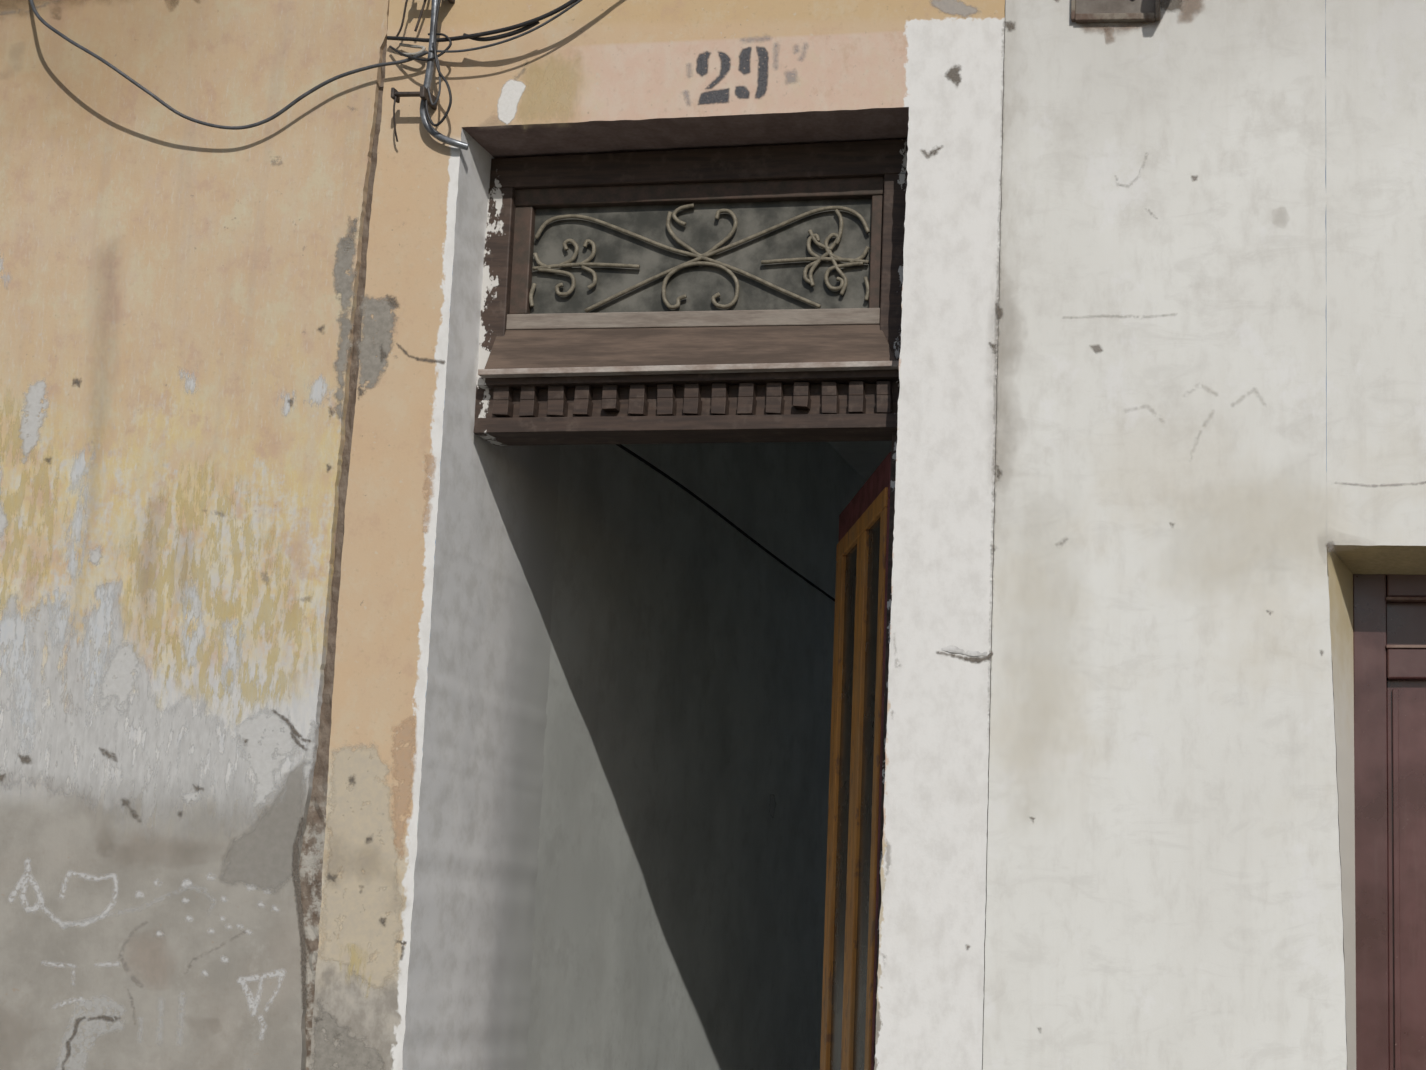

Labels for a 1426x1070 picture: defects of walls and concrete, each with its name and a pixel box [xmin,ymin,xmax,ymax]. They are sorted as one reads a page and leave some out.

flaking render [283,218,398,417]
crack [398,345,445,364]
peeling [0,381,314,817]
crack [292,42,387,1070]
peeling [424,455,435,532]
crack [1349,480,1426,488]
peeling [319,719,415,988]
crack [64,1016,117,1062]